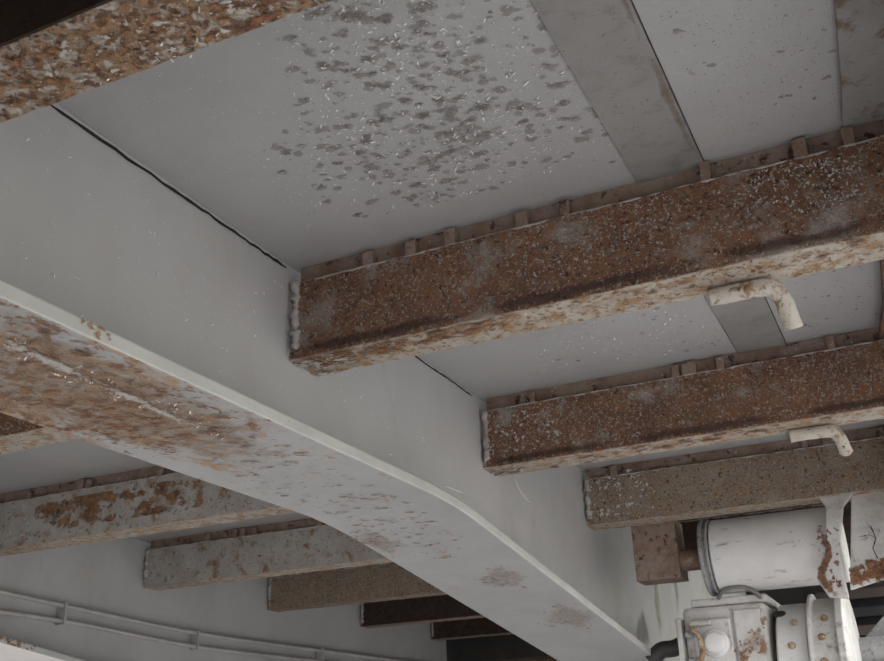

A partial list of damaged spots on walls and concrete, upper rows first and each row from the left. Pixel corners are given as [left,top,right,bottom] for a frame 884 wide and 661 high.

corrosion [7,0,190,100]
corrosion [211,0,316,37]
crack [50,105,287,268]
corrosion [729,224,884,260]
corrosion [303,259,792,367]
corrosion [0,323,316,497]
corrosion [496,419,778,468]
corrosion [809,398,884,420]
corrosion [35,480,203,527]
corrosion [817,525,884,595]